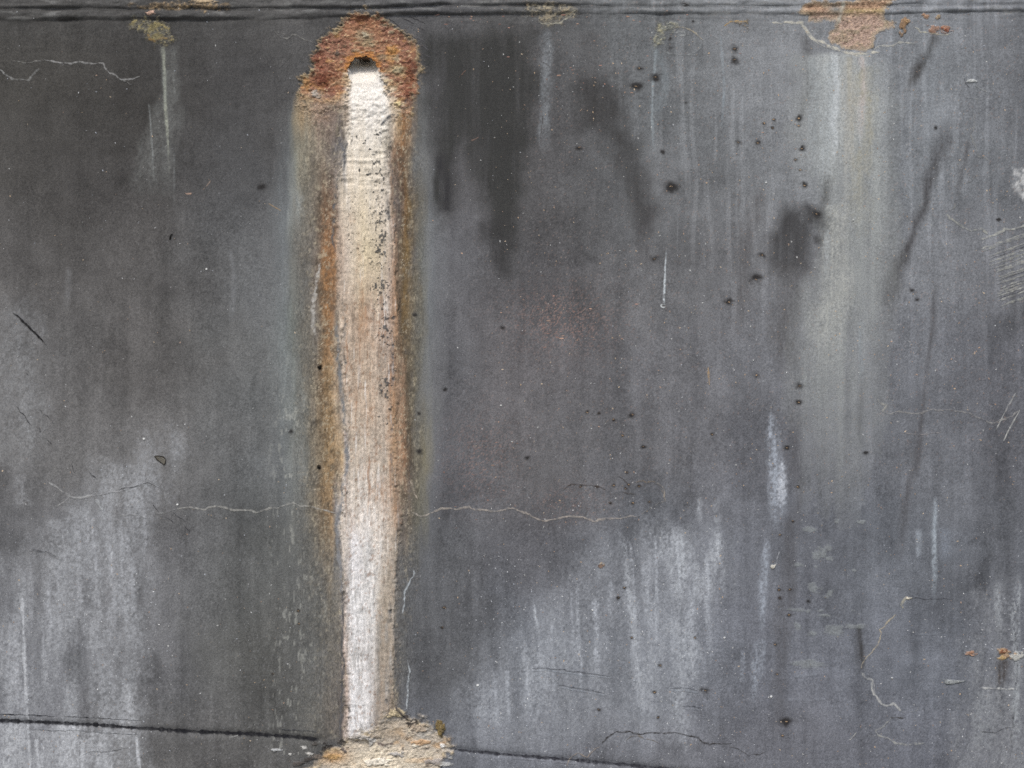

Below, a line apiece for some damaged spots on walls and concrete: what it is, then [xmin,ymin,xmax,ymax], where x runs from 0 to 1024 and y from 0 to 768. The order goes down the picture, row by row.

crack [0,59,142,85]
peeling [771,0,915,57]
rust [289,4,430,746]
damp [330,17,690,740]
damp [719,31,972,741]
crack [47,464,335,533]
crack [409,476,666,522]
spalling [268,706,458,768]
damp [445,470,741,759]
crack [861,596,953,746]
damp [937,567,1024,768]